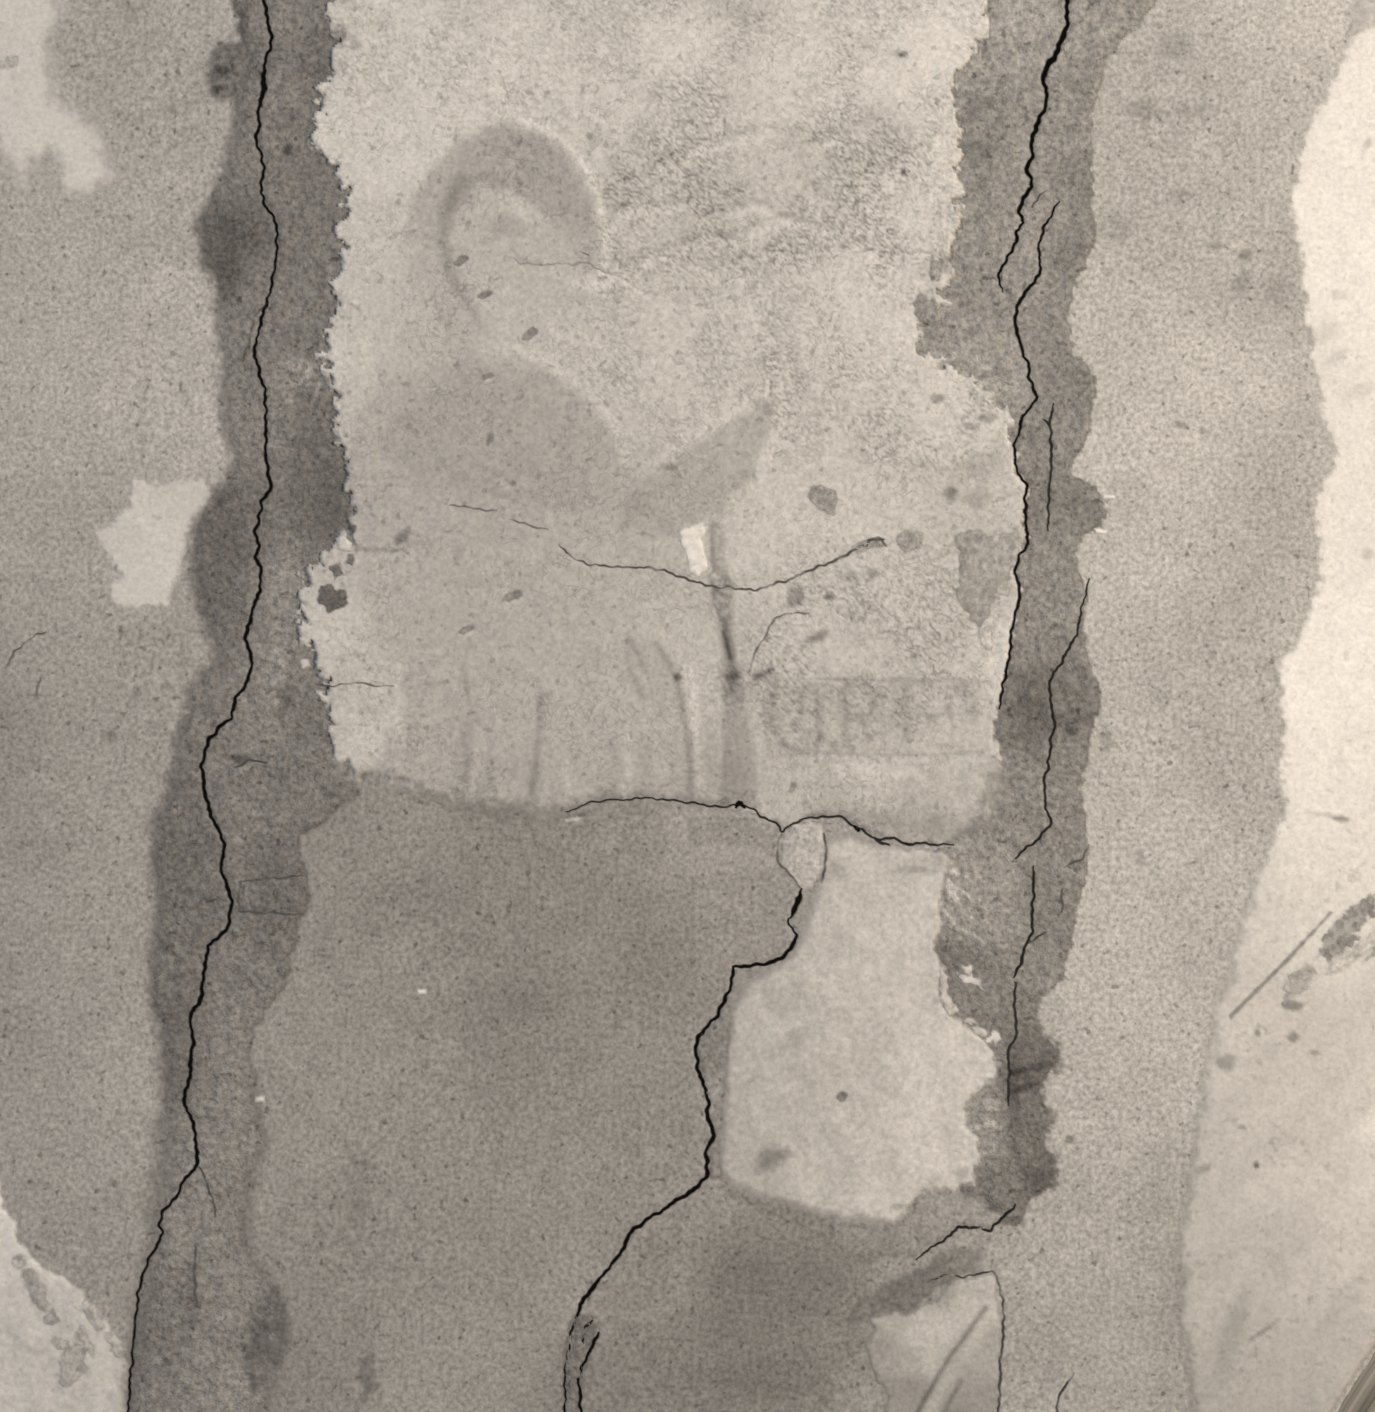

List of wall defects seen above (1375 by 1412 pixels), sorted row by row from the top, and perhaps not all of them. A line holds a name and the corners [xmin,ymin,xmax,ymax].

spalling [914,261,947,353]
crack [997,0,1070,709]
spalling [317,525,356,612]
crack [452,504,886,673]
crack [127,0,303,1412]
crack [1007,578,1090,1106]
spalling [939,965,1001,1044]
peeling [1231,896,1375,1017]
crack [563,797,954,1412]
spalling [563,1315,596,1412]
crack [916,1204,1016,1412]